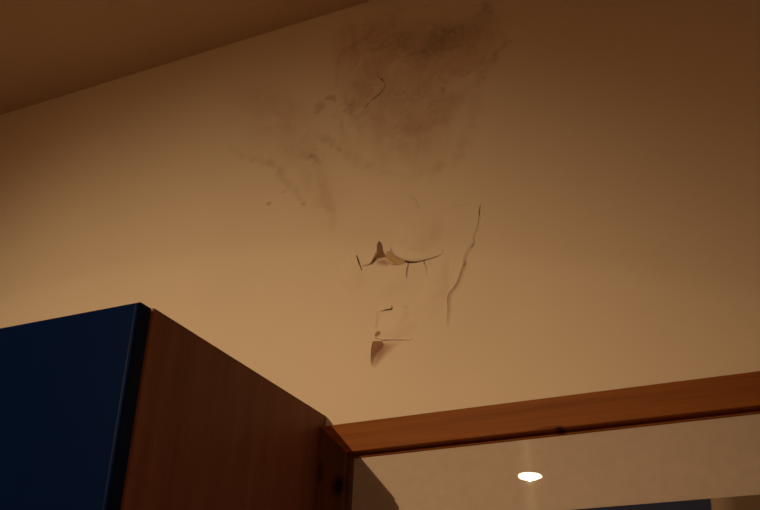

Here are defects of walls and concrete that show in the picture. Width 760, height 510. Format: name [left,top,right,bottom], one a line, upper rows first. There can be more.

peeling [361,241,443,266]
peeling [366,332,412,365]